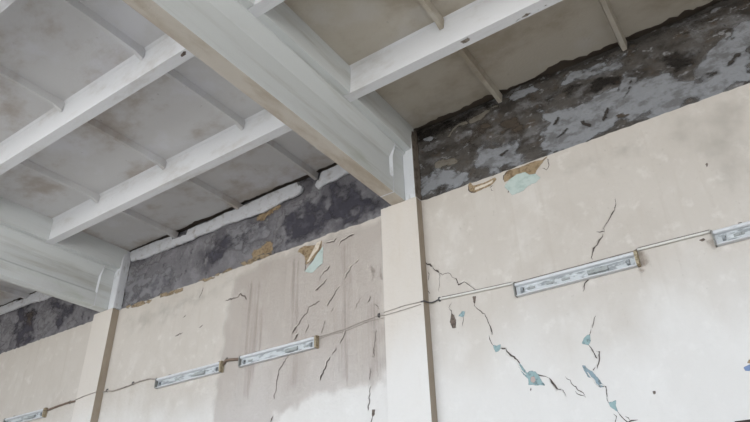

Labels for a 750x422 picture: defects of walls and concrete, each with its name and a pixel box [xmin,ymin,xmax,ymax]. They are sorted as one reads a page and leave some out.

spalling [417,0,750,200]
spalling [121,172,392,309]
crack [325,233,354,246]
crack [589,200,616,260]
crack [291,259,359,340]
crack [319,331,345,381]
crack [367,330,377,422]
crack [426,262,636,422]